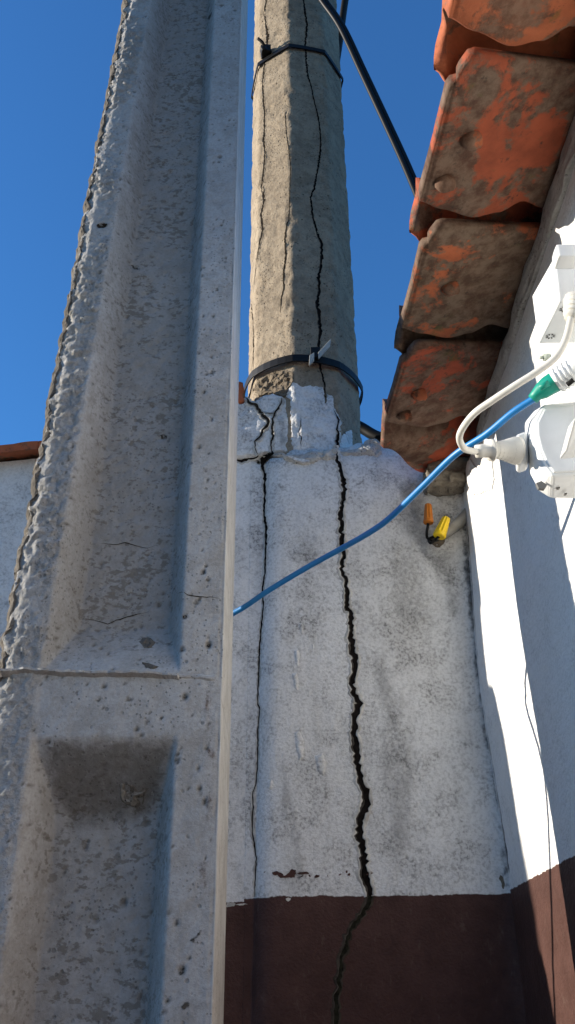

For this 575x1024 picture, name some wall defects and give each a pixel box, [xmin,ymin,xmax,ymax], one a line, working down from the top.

crack [237,397,302,897]
peeling [264,869,350,878]
crack [251,0,376,1024]